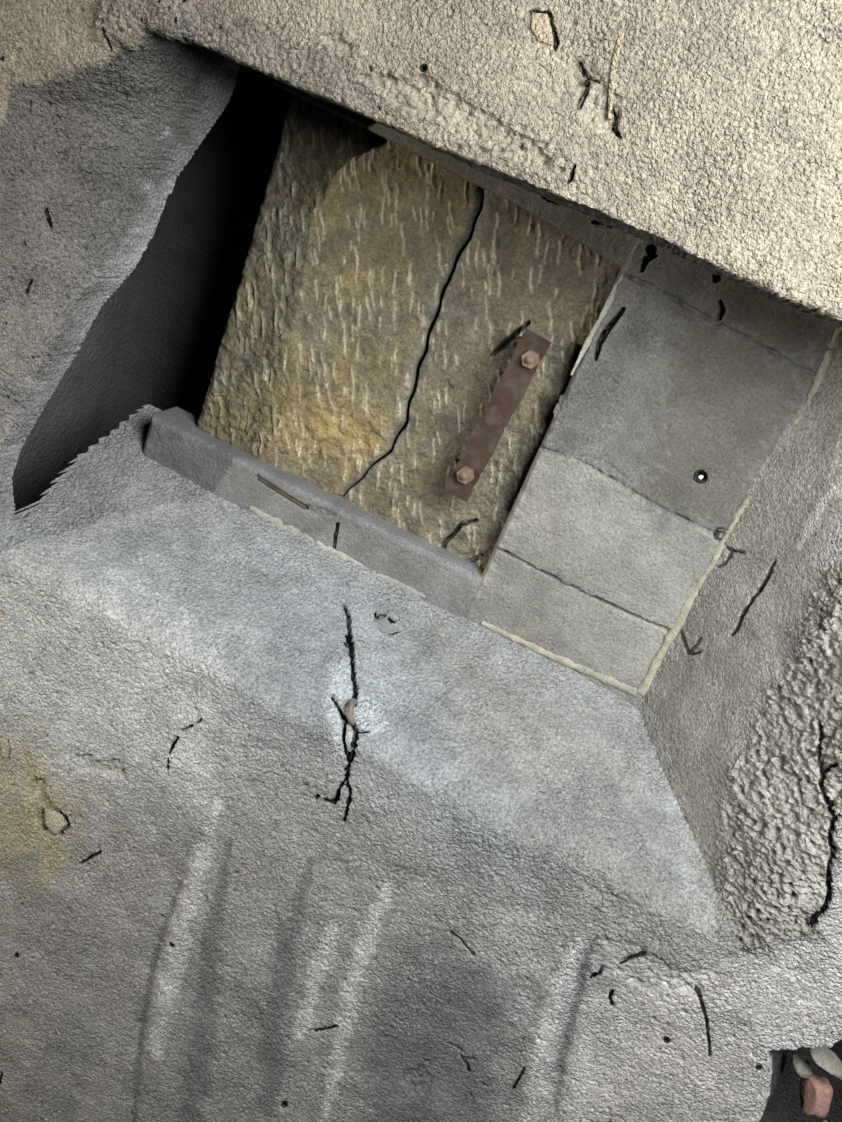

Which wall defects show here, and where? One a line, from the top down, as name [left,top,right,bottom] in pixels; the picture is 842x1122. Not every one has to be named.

crack [530,10,557,49]
crack [580,64,598,106]
crack [355,201,484,485]
crack [731,561,776,636]
crack [317,607,398,820]
crack [808,720,839,927]